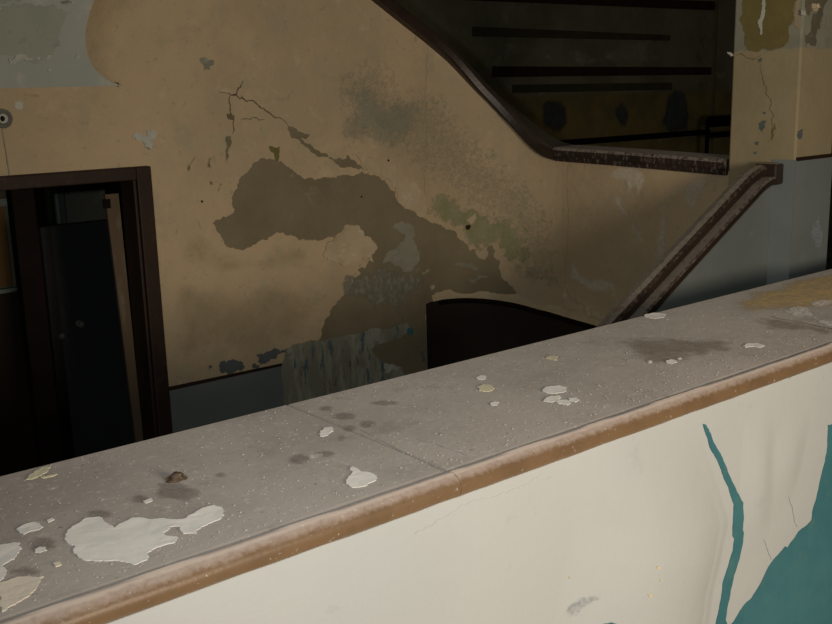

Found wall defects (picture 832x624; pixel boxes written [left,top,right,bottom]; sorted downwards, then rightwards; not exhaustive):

peeling [740,0,827,62]
crack [222,82,364,170]
water stain [431,195,529,261]
peeling [209,146,516,406]
water stain [744,276,832,310]
peeling [542,385,579,405]
peeling [26,466,57,480]
peeling [0,518,54,613]
peeling [65,505,224,565]
peeling [703,424,832,624]